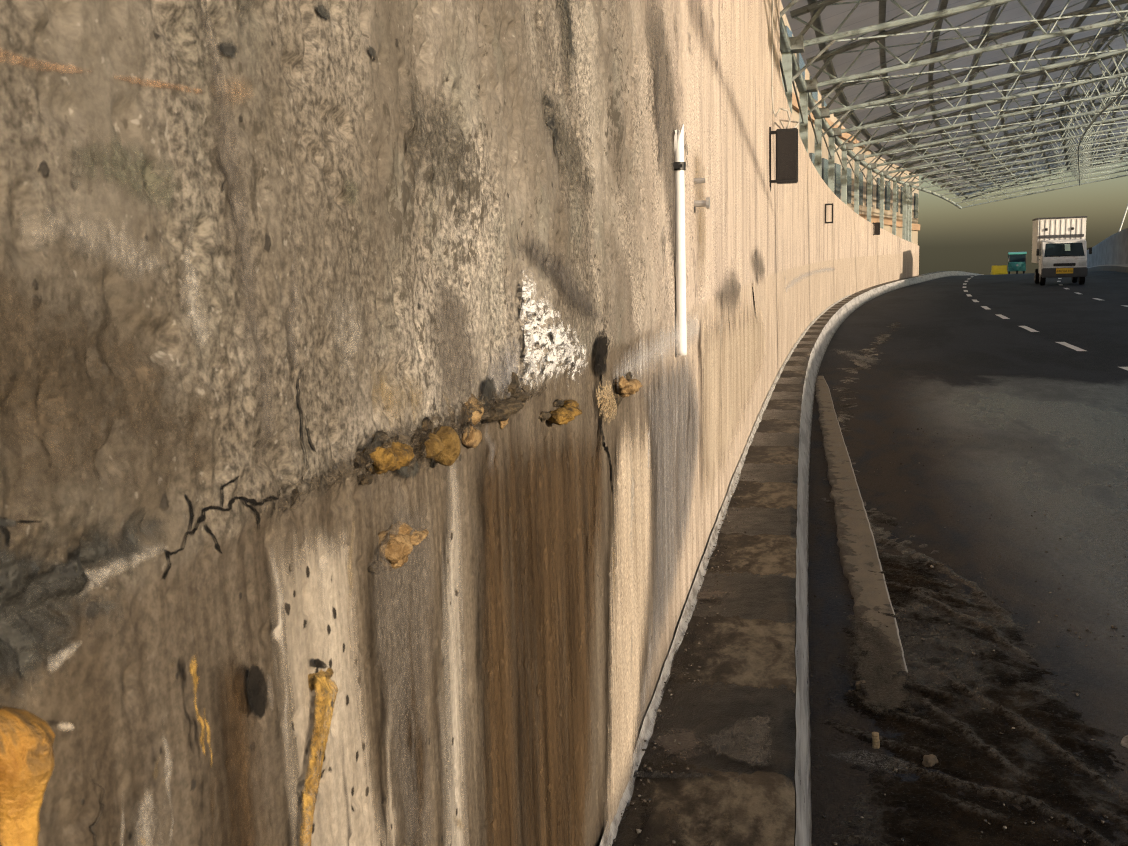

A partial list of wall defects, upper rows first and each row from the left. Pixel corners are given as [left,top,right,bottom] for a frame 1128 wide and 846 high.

damp [491,240,599,394]
spalling [0,509,159,693]
corrosion [190,661,212,762]
crack [156,359,317,580]
corrosion [301,659,338,846]
damp [447,487,463,846]
damp [483,434,602,846]
crack [594,376,614,507]
damp [608,280,774,830]